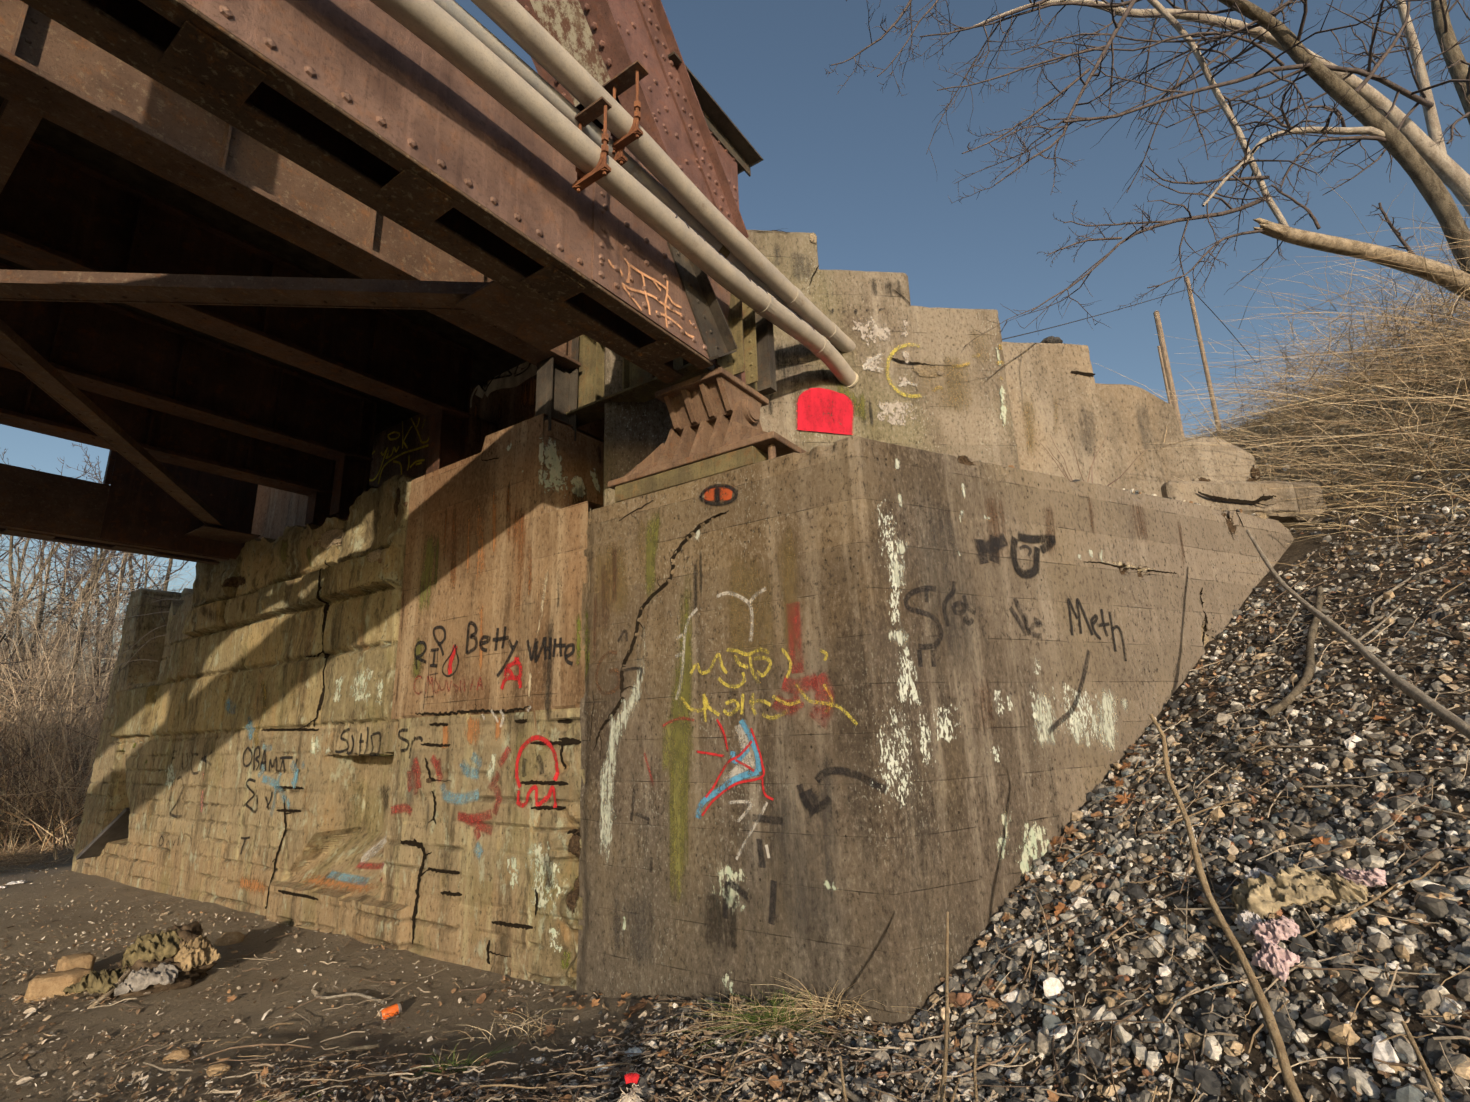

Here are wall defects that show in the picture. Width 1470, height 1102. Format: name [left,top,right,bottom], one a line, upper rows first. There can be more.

corrosion [521,378,537,409]
crack [415,699,530,716]
crack [590,510,729,759]
water stain [872,495,961,808]
crack [265,796,300,909]
crack [400,758,449,944]